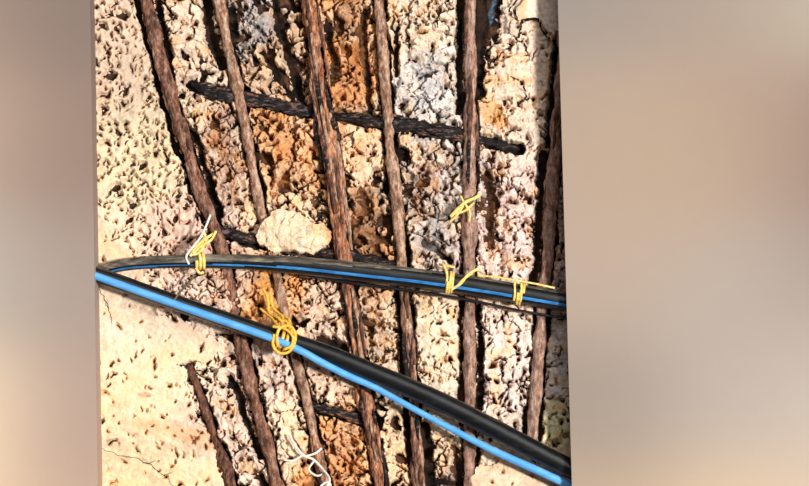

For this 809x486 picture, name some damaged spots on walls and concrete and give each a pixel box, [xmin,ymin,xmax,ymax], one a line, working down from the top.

spalling [94,0,566,292]
spalling [142,268,570,486]